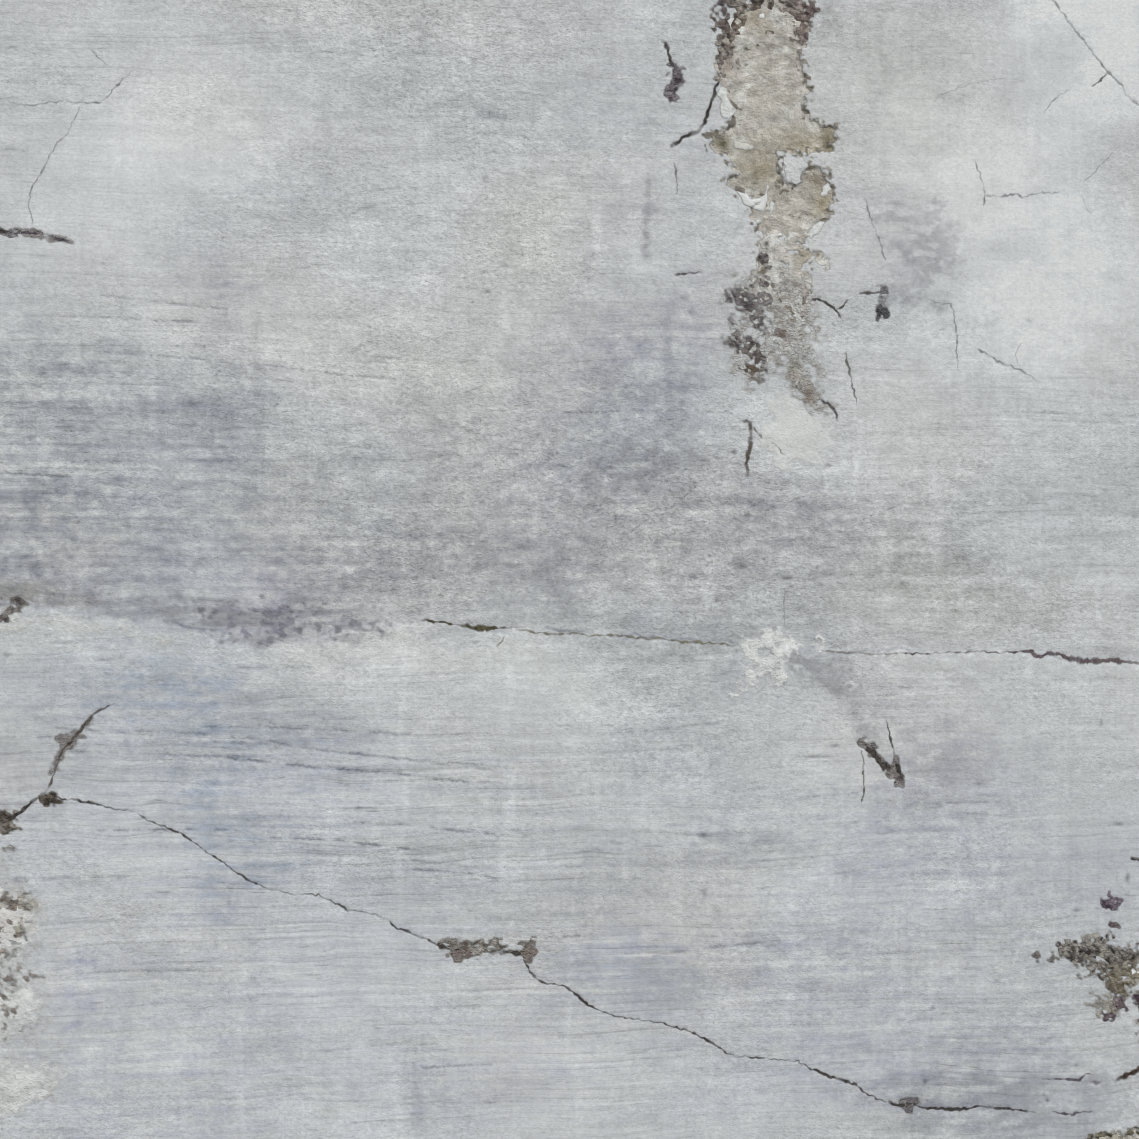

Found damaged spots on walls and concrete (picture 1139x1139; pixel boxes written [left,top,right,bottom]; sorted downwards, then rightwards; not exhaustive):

peeling [664,63,685,102]
peeling [702,0,841,471]
crack [426,619,725,645]
crack [905,649,1139,664]
crack [0,705,109,821]
spalling [857,737,904,788]
spalling [38,792,63,807]
peeling [1032,891,1139,1023]
flaking render [0,884,75,1119]
crack [390,922,773,1060]
crack [805,1064,1027,1112]
crack [1119,1066,1139,1079]